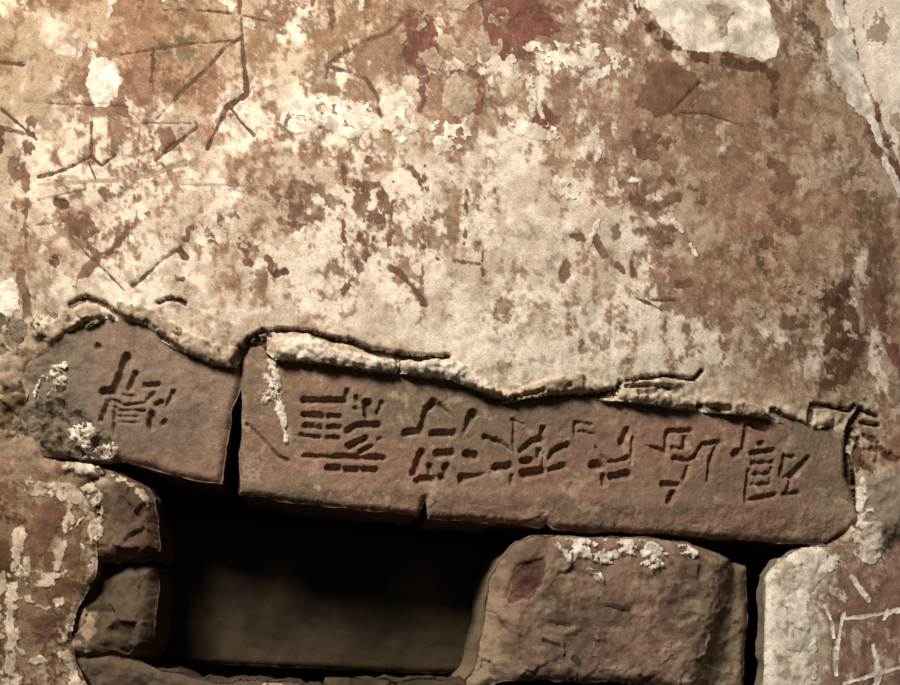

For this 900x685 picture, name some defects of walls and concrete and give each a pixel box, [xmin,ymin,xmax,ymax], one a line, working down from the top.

peeling [639,0,780,62]
peeling [852,273,866,334]
spalling [238,333,272,361]
crack [245,328,450,374]
crack [580,369,703,400]
peeling [873,341,900,401]
spalling [54,460,103,477]
spalling [507,559,545,602]
damp [555,538,668,582]
damp [676,543,699,558]
spalling [604,603,630,611]